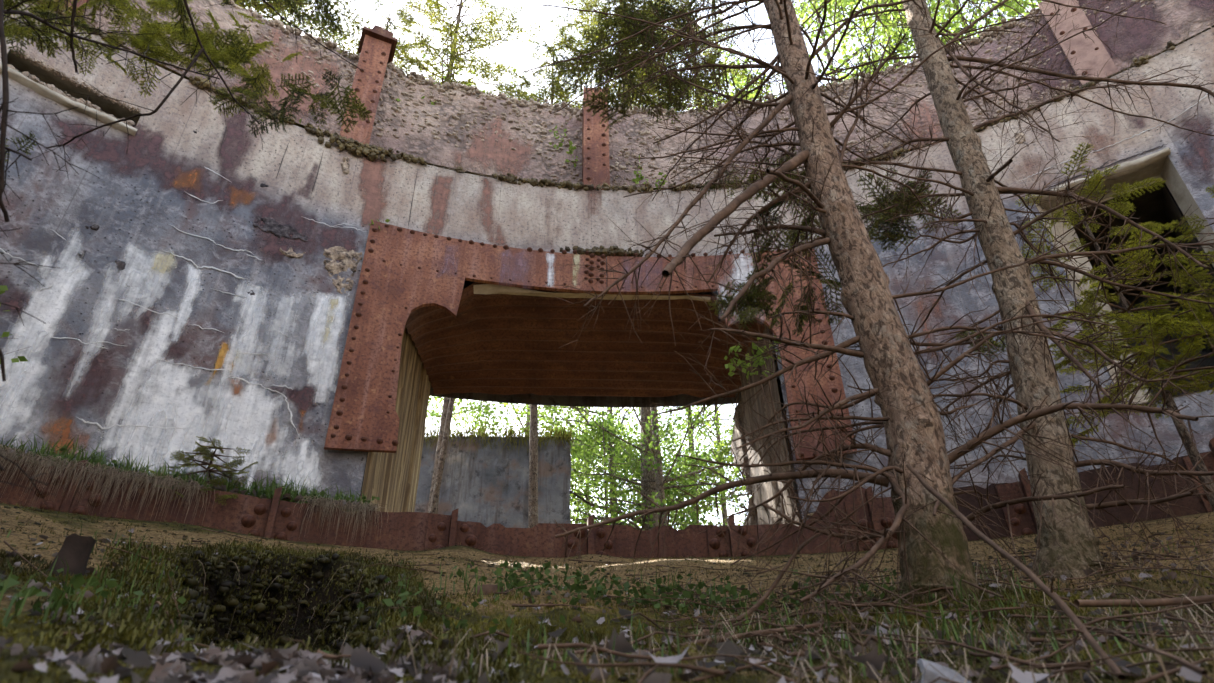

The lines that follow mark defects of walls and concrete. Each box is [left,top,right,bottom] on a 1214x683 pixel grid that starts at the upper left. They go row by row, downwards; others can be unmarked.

spalling [253,215,308,259]
spalling [323,246,362,294]
corrosion [359,155,387,225]
corrosion [424,176,453,234]
corrosion [480,178,526,282]
leakage [0,233,89,439]
leakage [51,245,346,497]